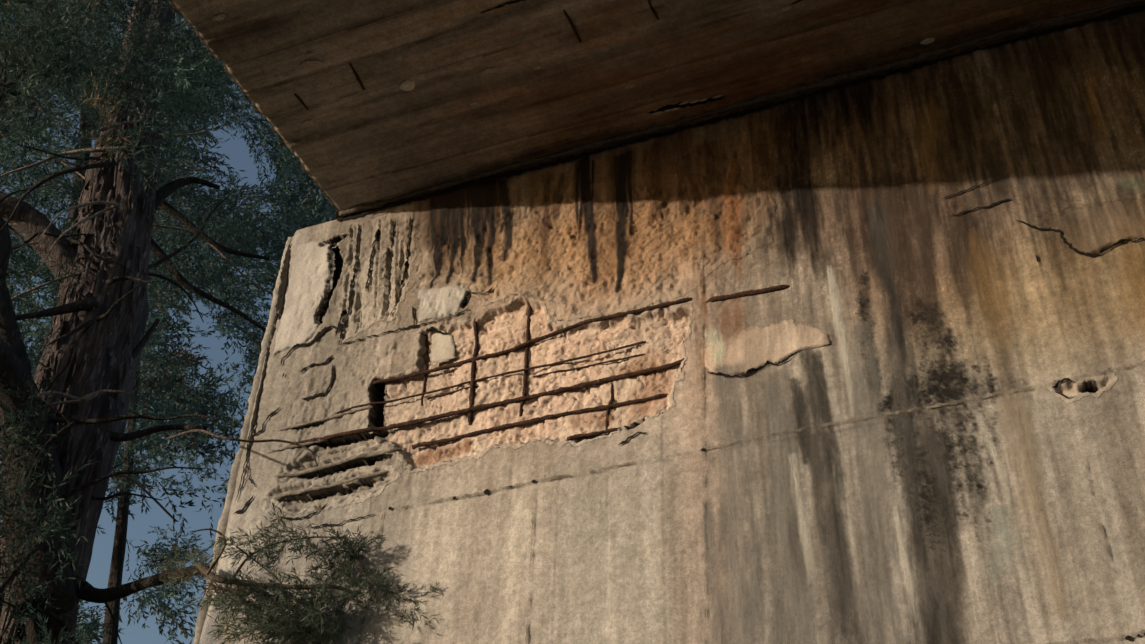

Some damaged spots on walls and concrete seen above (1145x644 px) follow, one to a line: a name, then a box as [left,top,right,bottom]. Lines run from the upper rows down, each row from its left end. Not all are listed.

damp [418,148,570,288]
spalling [264,169,777,515]
damp [539,155,597,283]
crack [235,4,1145,513]
corrosion [706,285,790,303]
damp [704,181,1035,644]
spalling [1047,371,1118,404]